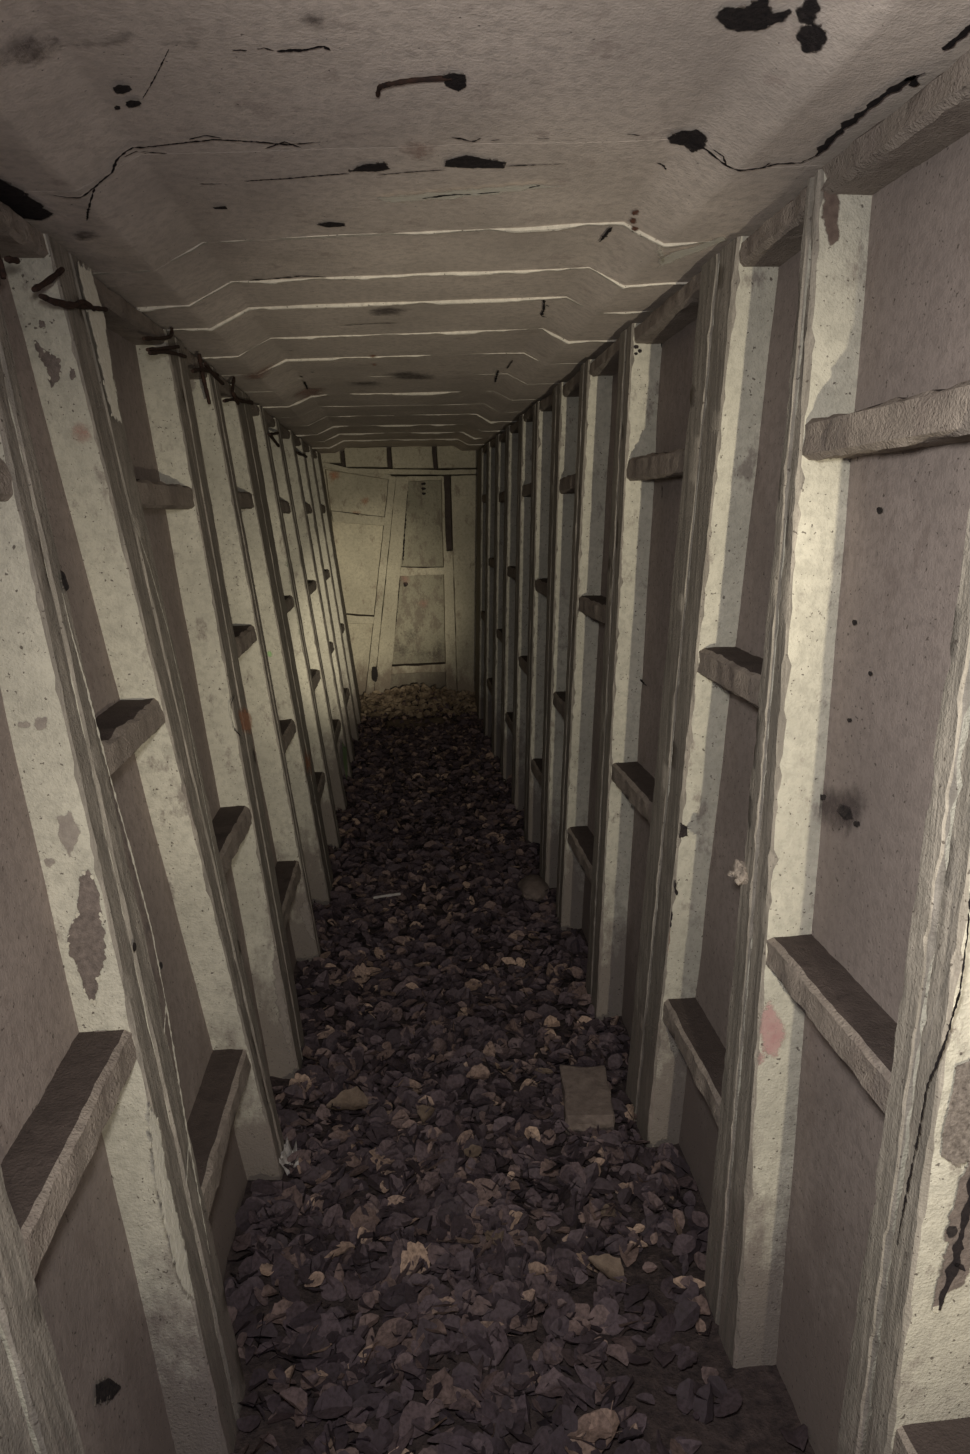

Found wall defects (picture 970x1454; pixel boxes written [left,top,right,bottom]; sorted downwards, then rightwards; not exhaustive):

crack [54,135,551,220]
spalling [348,161,390,172]
spalling [375,73,466,98]
spalling [445,155,507,169]
spalling [716,0,827,53]
crack [631,25,970,171]
peeling [65,870,106,1006]
crack [897,893,970,1243]
peeling [932,1059,970,1313]
crack [939,1178,970,1311]